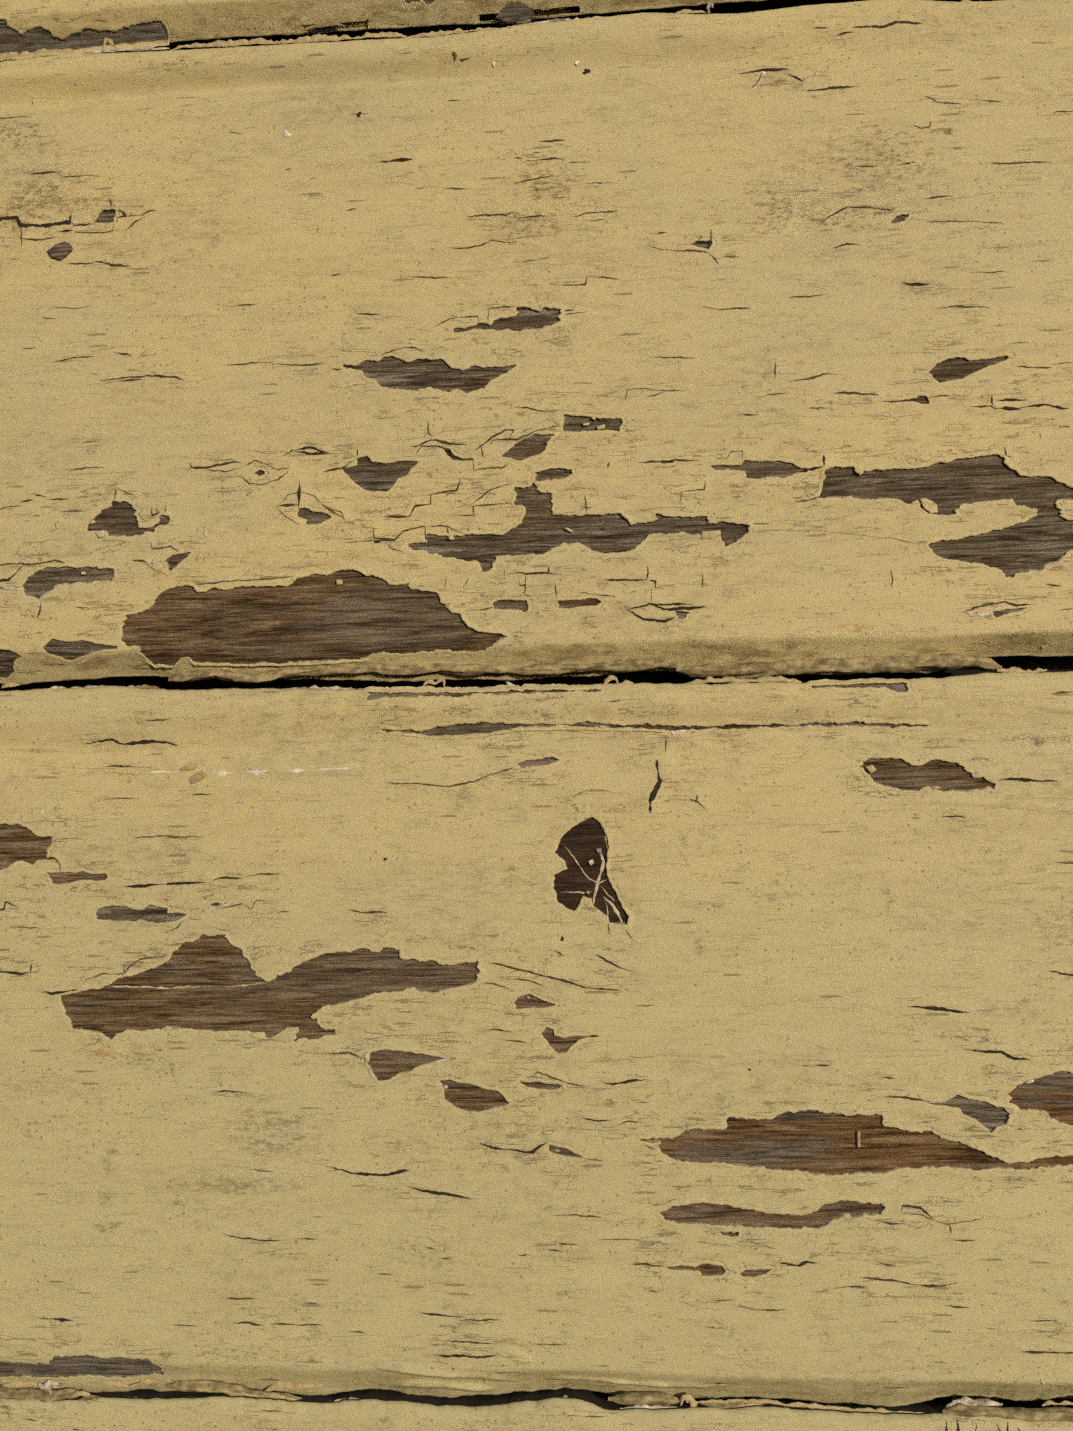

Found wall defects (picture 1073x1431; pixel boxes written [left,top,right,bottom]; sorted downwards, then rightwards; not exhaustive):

peeling [339,352,521,398]
peeling [404,411,755,577]
peeling [706,450,1073,582]
peeling [0,548,532,682]
peeling [362,683,935,739]
peeling [807,678,912,696]
peeling [855,753,1000,796]
peeling [0,820,111,889]
peeling [549,812,634,930]
peeling [56,900,485,1046]
peeling [635,1065,1073,1241]
crack [945,1420,1020,1431]